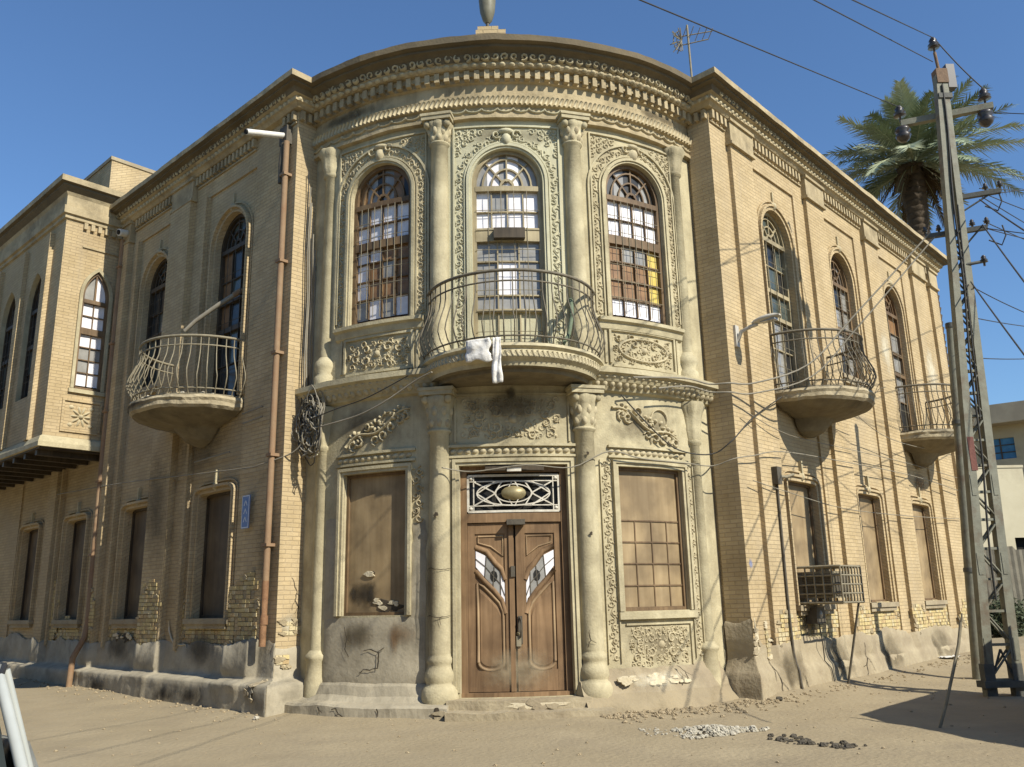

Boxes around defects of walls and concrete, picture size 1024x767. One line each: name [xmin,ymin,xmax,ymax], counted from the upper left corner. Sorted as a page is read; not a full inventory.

spalling [107,578,162,645]
spalling [180,567,260,645]
crack [344,627,384,673]
flaking render [616,672,692,687]